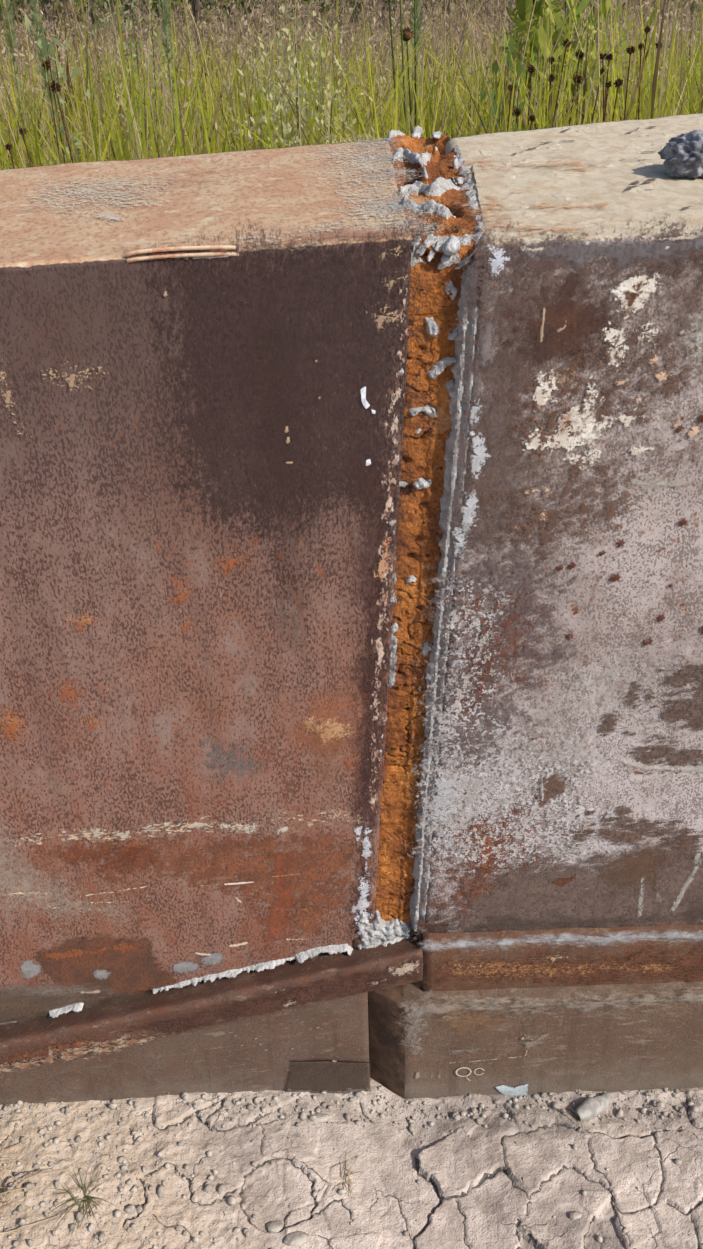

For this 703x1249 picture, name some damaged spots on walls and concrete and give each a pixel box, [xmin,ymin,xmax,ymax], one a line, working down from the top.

peeling [480,126,673,218]
peeling [506,218,703,386]
spalling [360,126,485,813]
peeling [523,365,645,470]
peeling [629,443,654,456]
rust [417,189,703,924]
rust [299,697,360,767]
damp [412,695,542,866]
rust [36,937,177,998]
rust [33,826,361,949]
peeling [352,826,374,935]
damp [420,931,703,950]